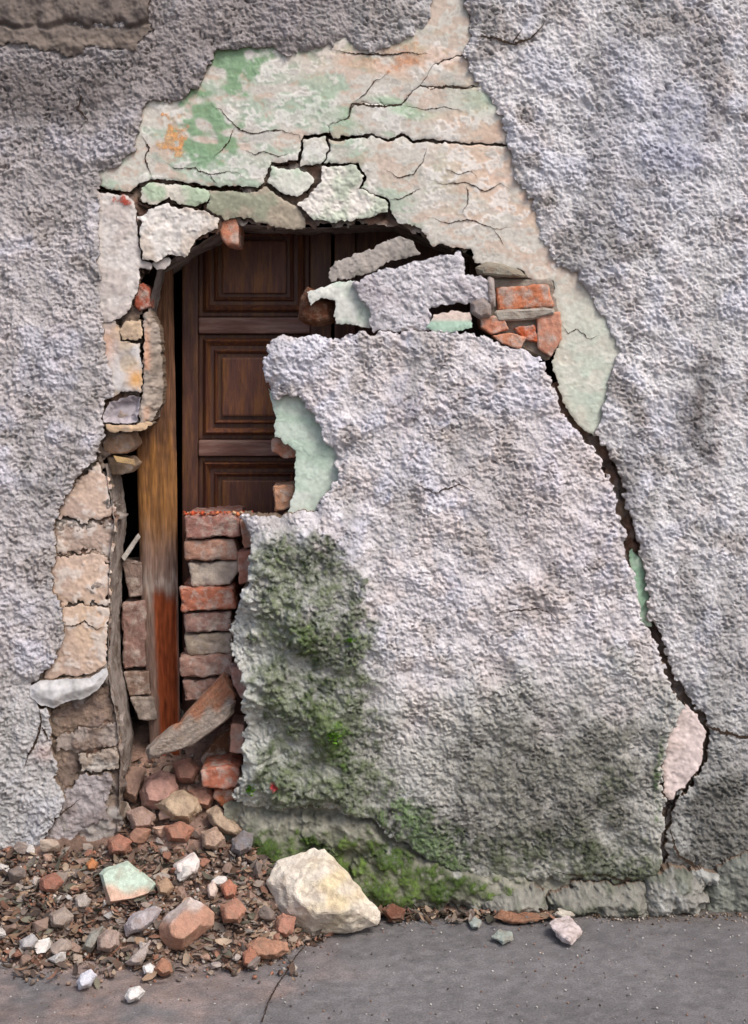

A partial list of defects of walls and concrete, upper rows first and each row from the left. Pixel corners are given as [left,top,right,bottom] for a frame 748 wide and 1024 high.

crack [102,23,544,244]
peeling [96,0,621,436]
crack [539,354,557,385]
spalling [29,462,122,840]
damp [452,706,661,884]
crack [556,871,641,882]
crack [664,800,702,869]
spalling [661,701,706,800]